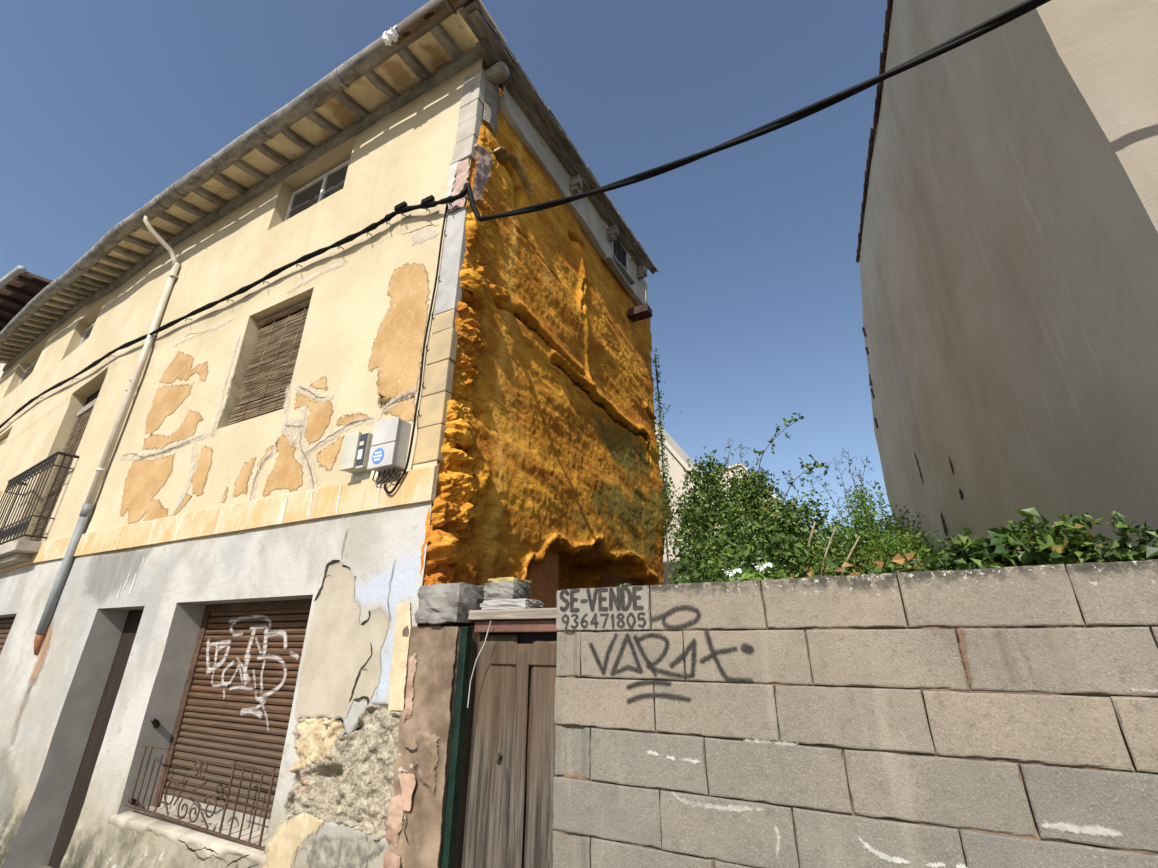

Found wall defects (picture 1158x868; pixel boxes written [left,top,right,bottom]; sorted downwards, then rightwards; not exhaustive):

flaking render [445,144,493,213]
peeling [120,351,213,524]
peeling [221,262,430,502]
crack [314,531,356,601]
flaking render [263,562,441,868]
crack [349,558,396,733]
spalling [521,532,658,608]